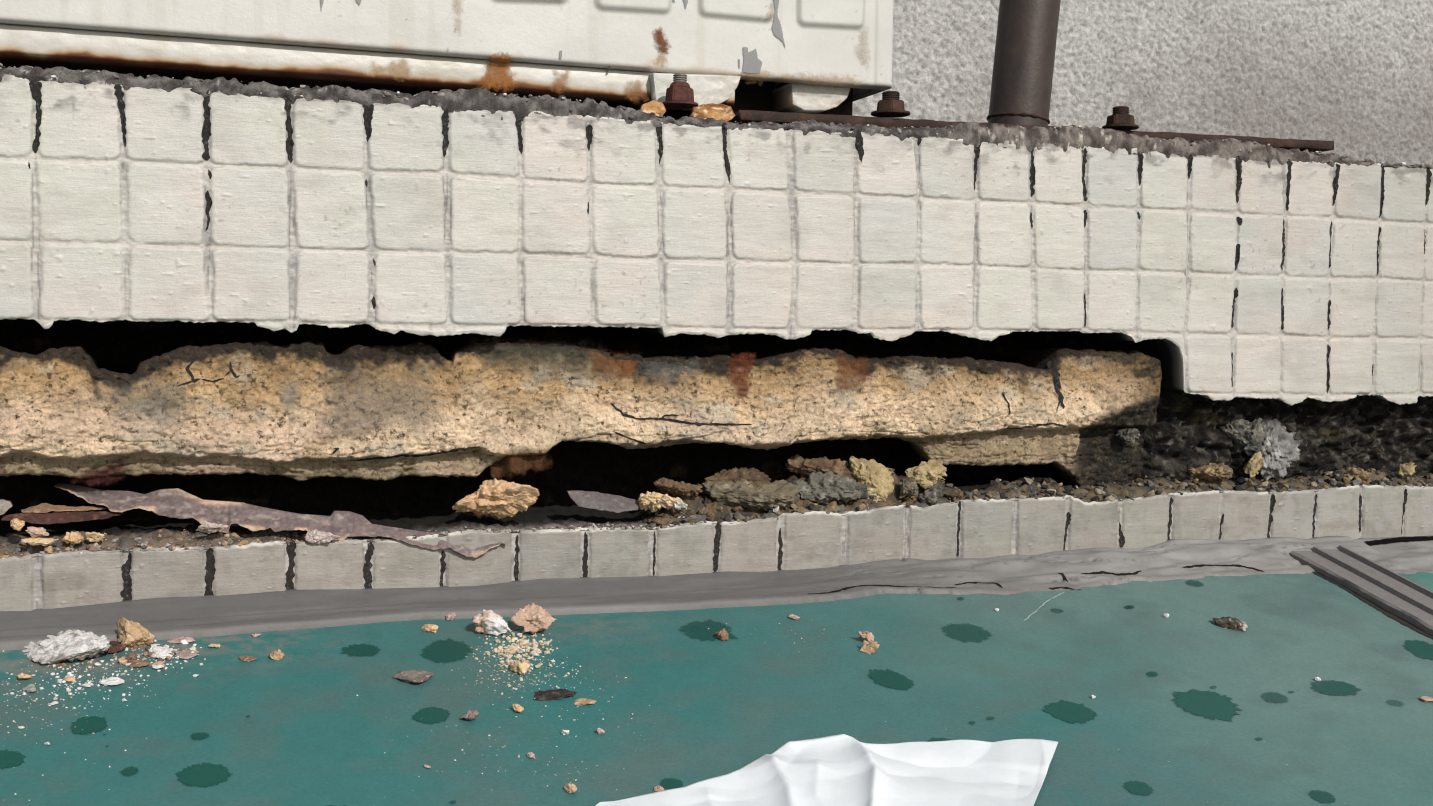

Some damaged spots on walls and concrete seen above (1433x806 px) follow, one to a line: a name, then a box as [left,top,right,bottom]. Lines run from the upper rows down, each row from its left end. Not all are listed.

rust [591,352,634,377]
rust [731,354,754,396]
crack [611,403,752,444]
spalling [0,318,1433,557]